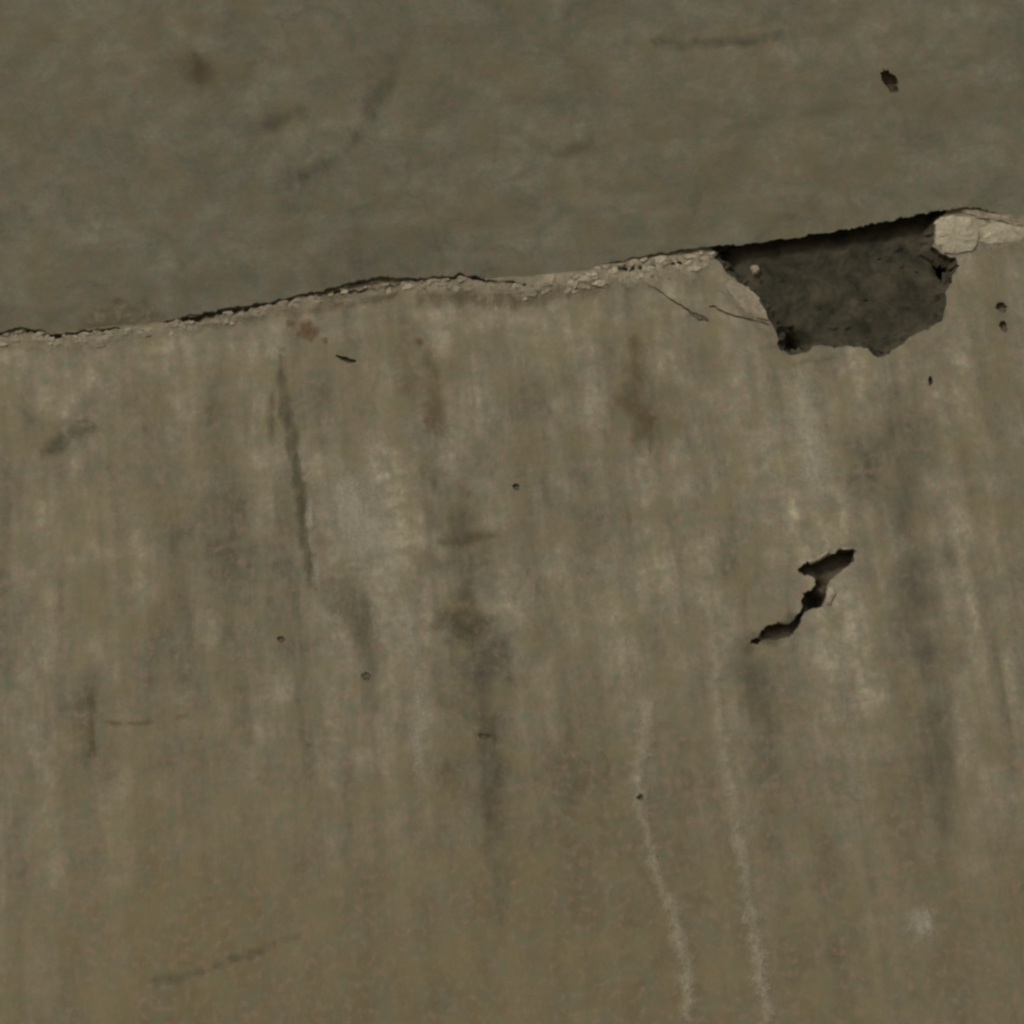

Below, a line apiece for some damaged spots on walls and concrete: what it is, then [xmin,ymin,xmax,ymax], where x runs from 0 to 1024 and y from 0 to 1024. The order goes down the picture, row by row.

crack [0,275,572,352]
crack [644,282,770,325]
spalling [566,209,1024,366]
water stain [265,347,518,953]
spalling [736,539,859,658]